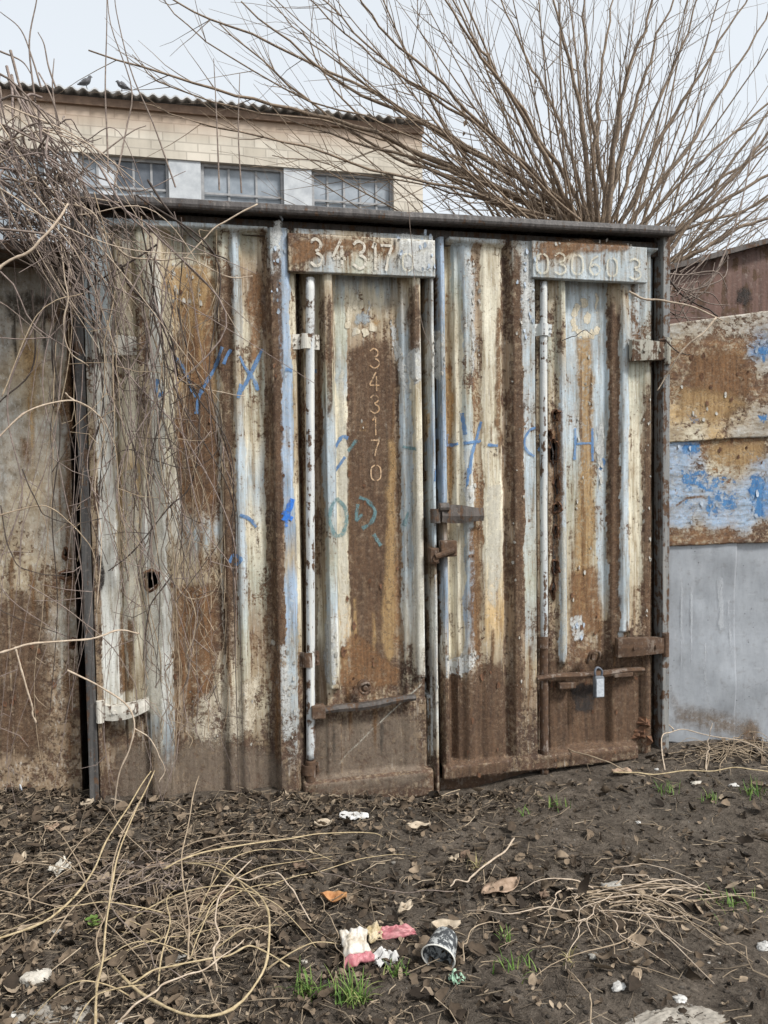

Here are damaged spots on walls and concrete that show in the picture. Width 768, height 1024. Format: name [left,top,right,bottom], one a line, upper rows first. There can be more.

rust [0,291,72,757]
rust [162,263,235,747]
rust [247,239,395,758]
rust [316,341,423,791]
rust [446,254,652,778]
rust [537,238,633,263]
rust [678,349,749,423]
peeling [681,470,768,518]